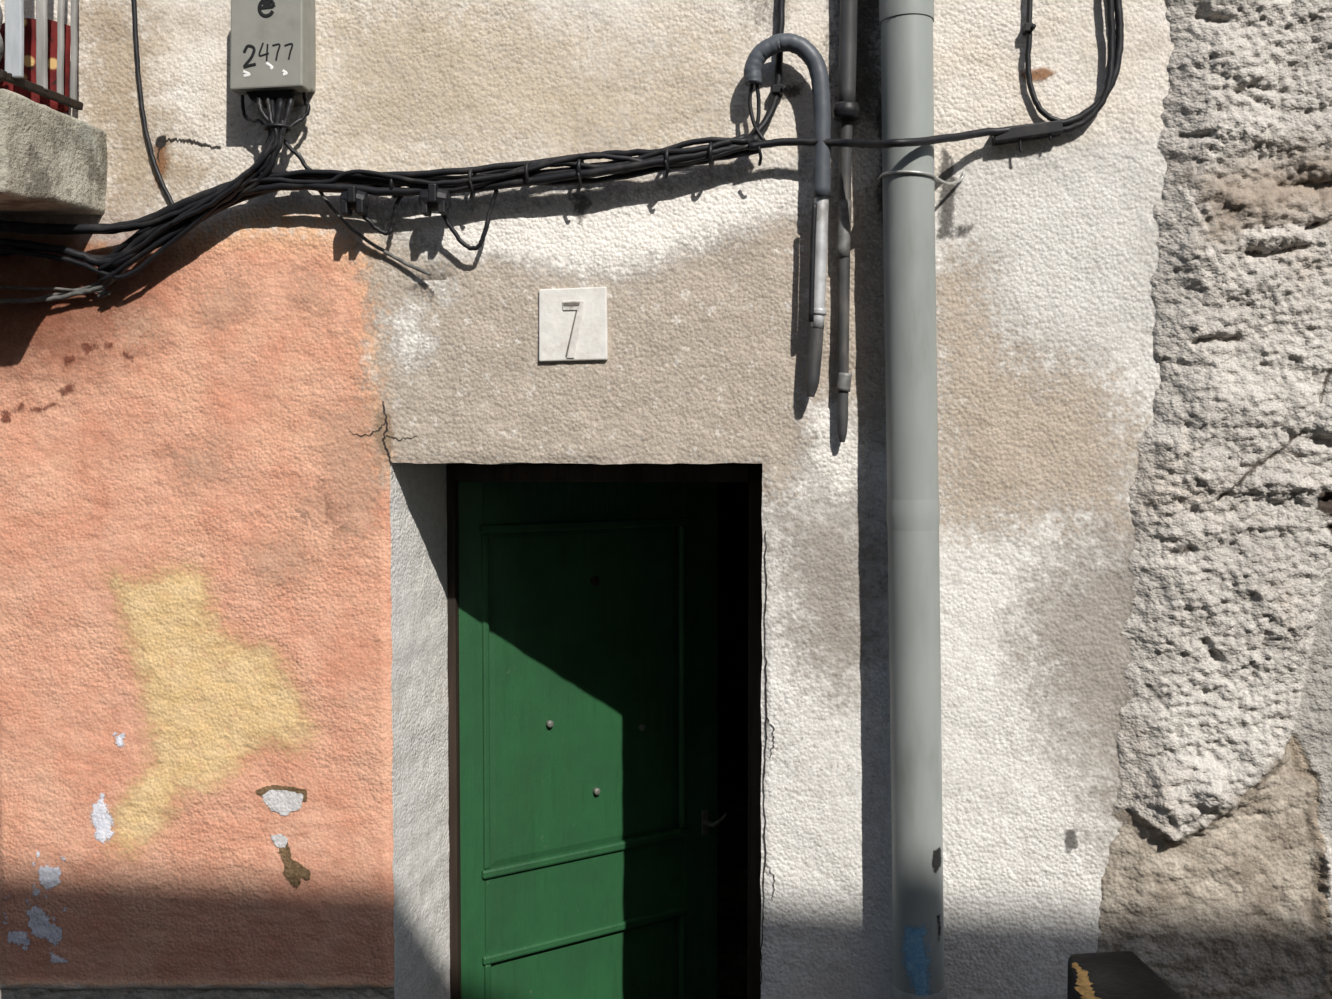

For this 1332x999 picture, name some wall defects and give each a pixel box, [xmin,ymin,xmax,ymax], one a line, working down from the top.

crack [350,401,417,472]
peeling [2,851,69,964]
peeling [90,565,315,852]
spalling [271,834,310,889]
crack [759,531,775,992]
peeling [1095,746,1330,999]